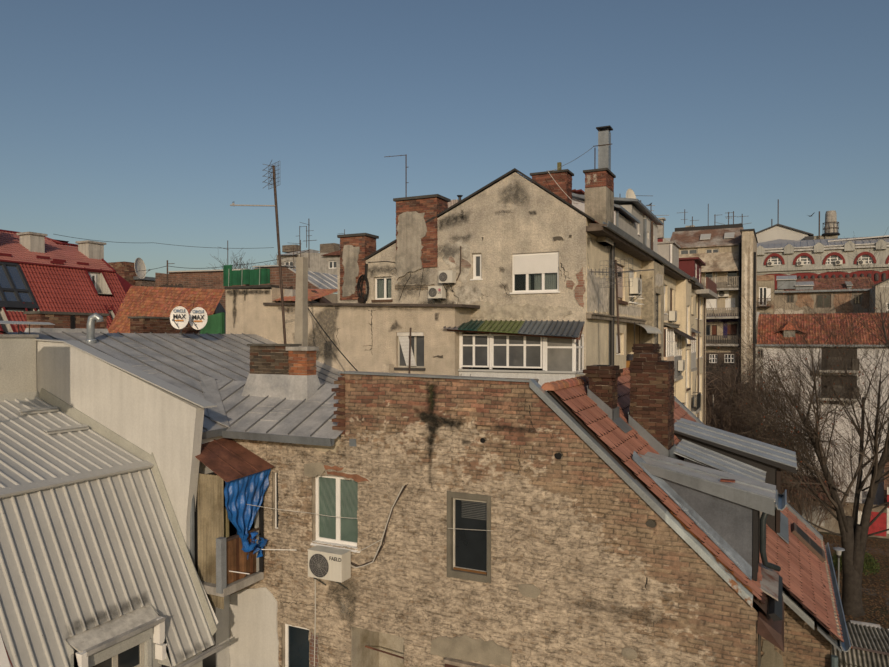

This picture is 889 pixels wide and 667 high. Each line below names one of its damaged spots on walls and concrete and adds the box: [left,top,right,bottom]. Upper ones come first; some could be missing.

flaking render [440,239,663,343]
damp [308,308,338,360]
damp [419,384,462,458]